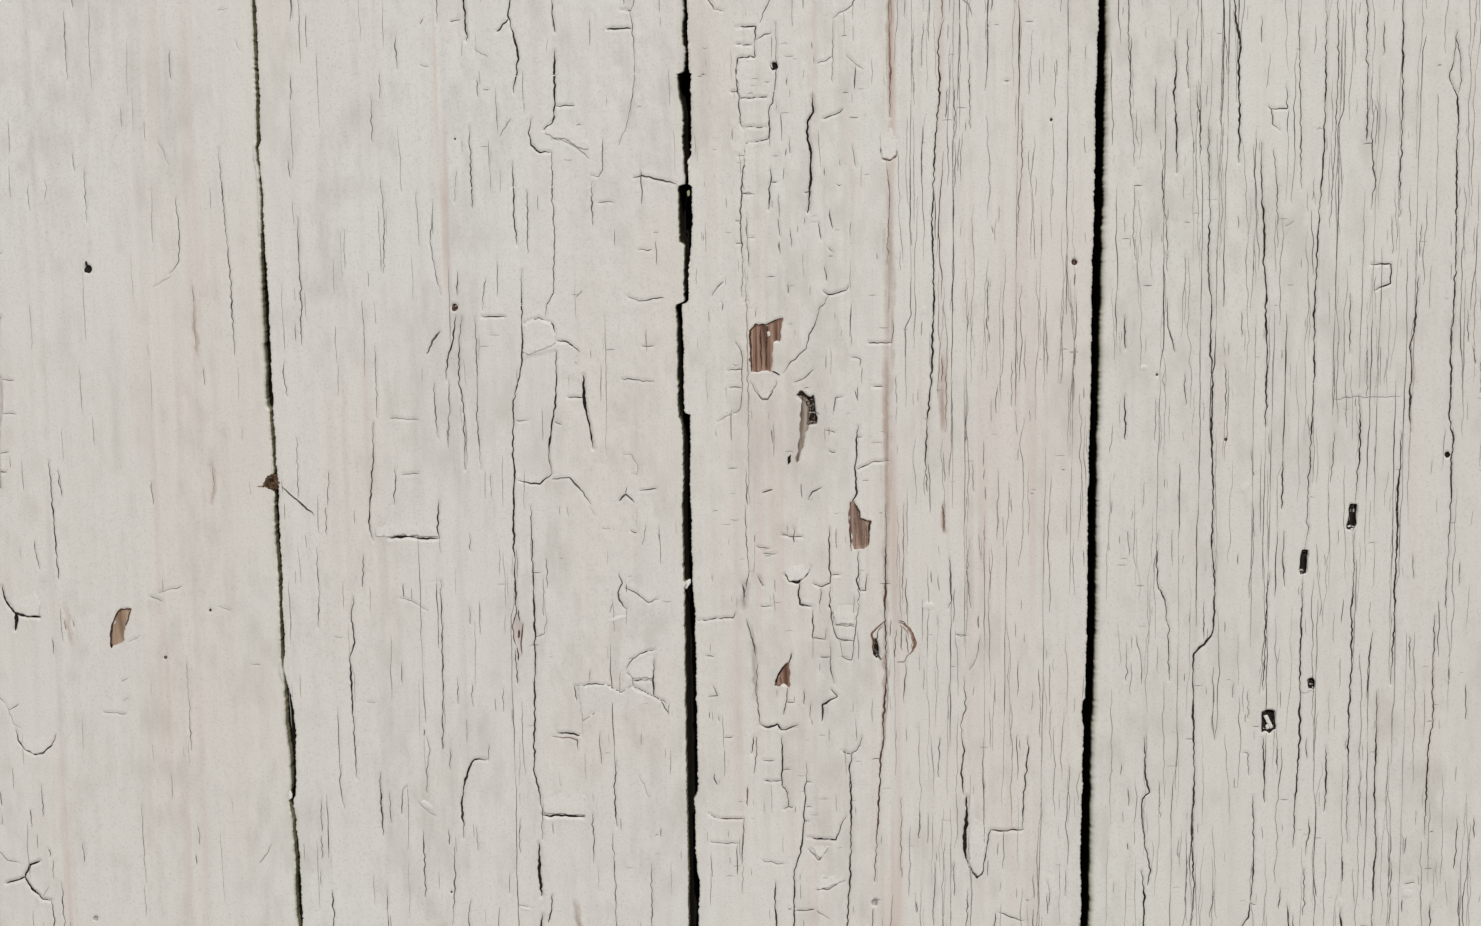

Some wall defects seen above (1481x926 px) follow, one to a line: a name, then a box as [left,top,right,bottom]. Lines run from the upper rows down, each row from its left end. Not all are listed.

crack [8,125,87,222]
crack [63,0,239,395]
peeling [749,318,783,399]
peeling [787,390,818,464]
crack [1,371,95,655]
peeling [848,501,872,550]
peeling [110,607,132,648]
peeling [774,662,791,687]
crack [141,665,192,911]